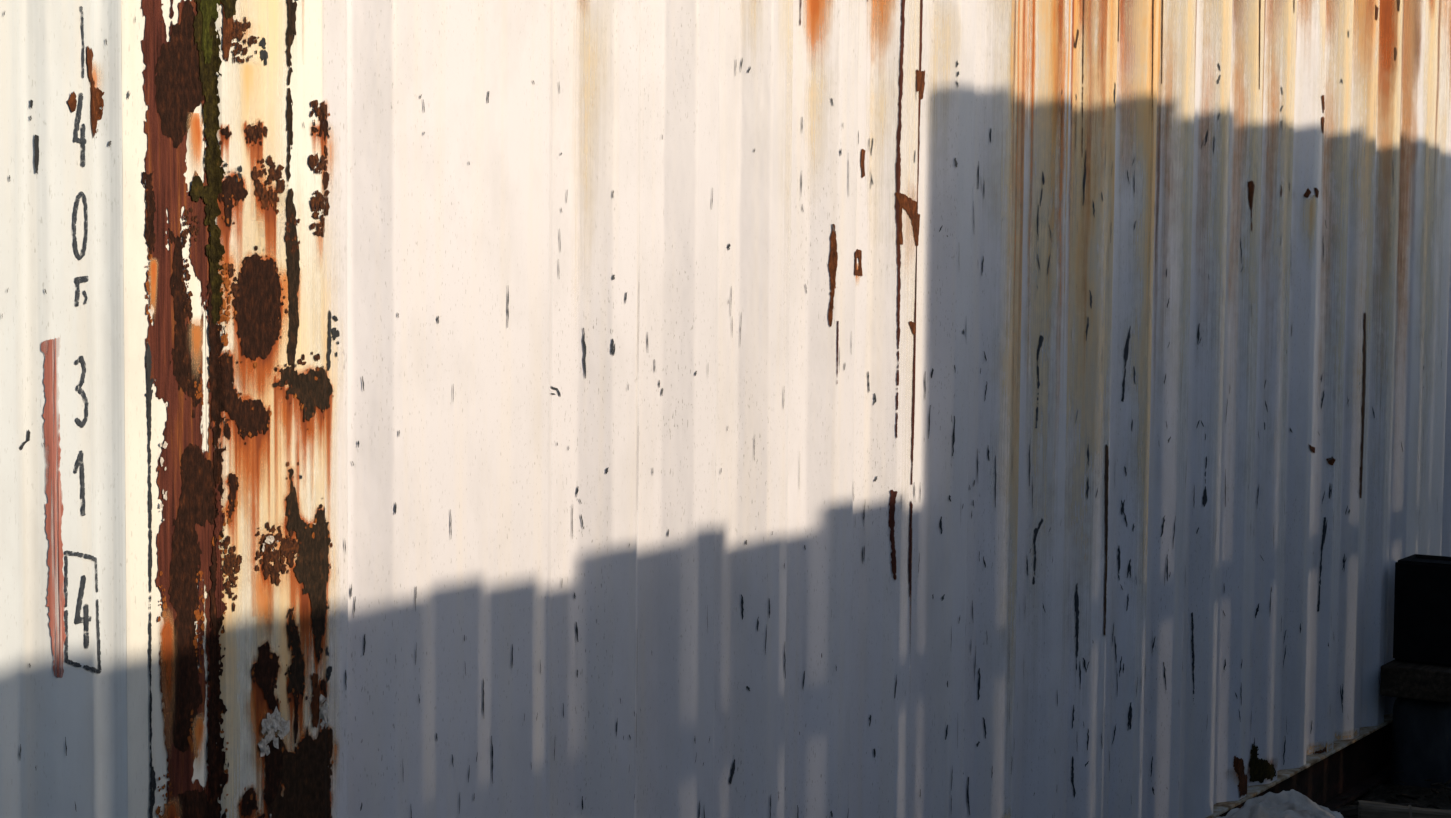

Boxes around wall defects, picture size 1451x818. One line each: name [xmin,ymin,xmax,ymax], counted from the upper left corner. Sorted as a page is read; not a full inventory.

rust [220,0,237,61]
rust [800,0,826,52]
rust [312,113,331,141]
rust [1167,0,1451,336]
rust [217,120,280,299]
rust [828,224,863,384]
rust [867,0,925,623]
spalling [127,0,347,818]
rust [225,473,239,546]
rust [310,646,332,728]
rust [238,786,271,818]
rust [1233,744,1277,798]